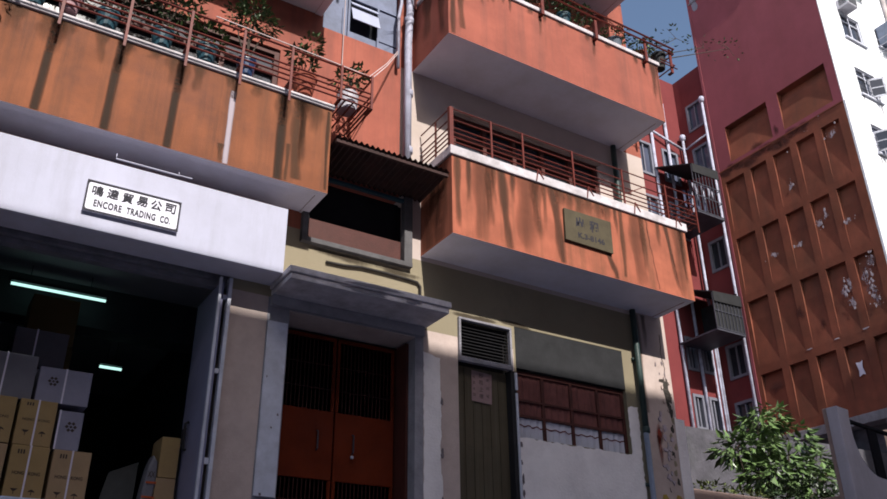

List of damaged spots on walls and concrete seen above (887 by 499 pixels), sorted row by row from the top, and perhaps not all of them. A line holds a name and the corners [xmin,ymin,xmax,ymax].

damp [30,13,71,110]
damp [99,39,132,130]
damp [163,57,203,148]
damp [218,75,238,164]
damp [273,93,330,187]
damp [455,156,470,217]
damp [487,167,514,238]
damp [532,181,626,279]
damp [655,223,685,269]
peeling [842,279,856,309]
peeling [859,250,884,308]
peeling [655,335,681,493]